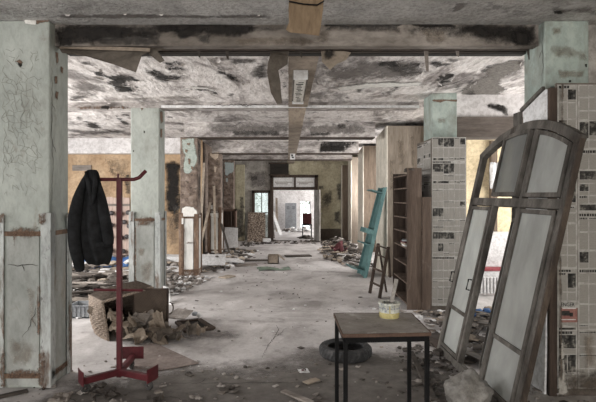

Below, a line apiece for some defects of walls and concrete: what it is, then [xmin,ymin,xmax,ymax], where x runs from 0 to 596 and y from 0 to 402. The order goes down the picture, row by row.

damp [55,24,271,46]
damp [412,24,536,46]
crack [1,48,56,196]
peeling [182,138,197,174]
damp [165,161,180,229]
corrosion [11,213,46,245]
corrosion [131,211,153,281]
corrosion [0,353,46,388]